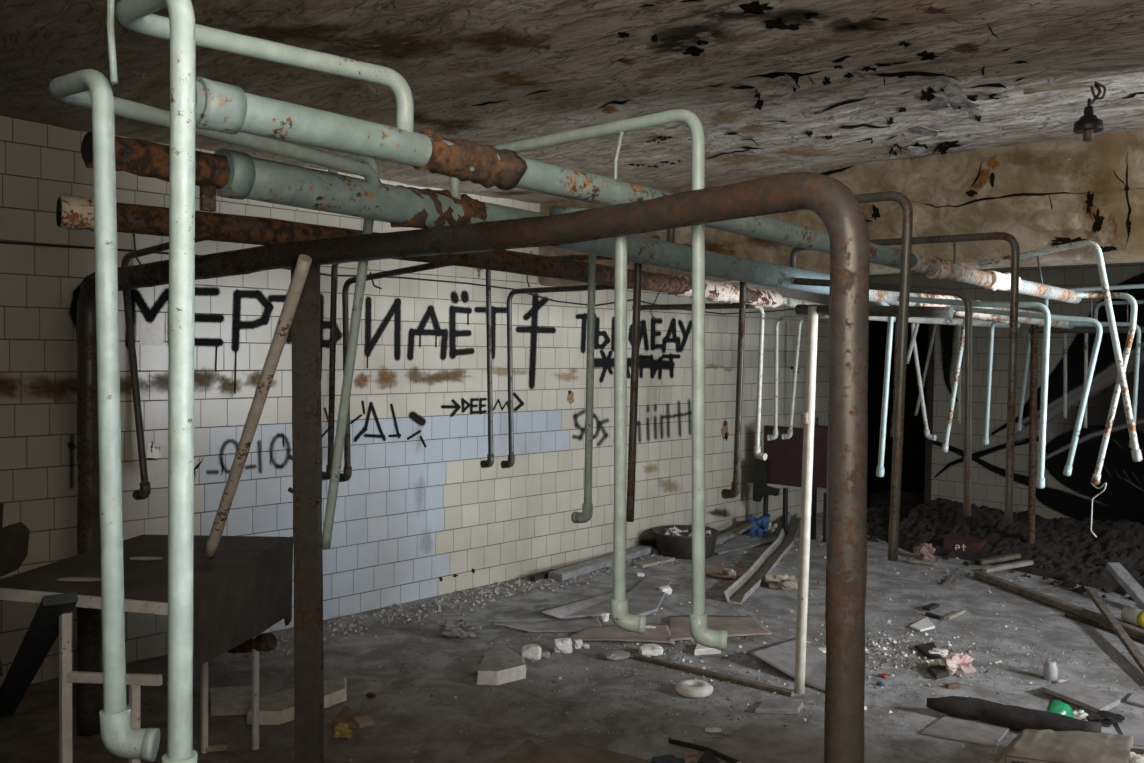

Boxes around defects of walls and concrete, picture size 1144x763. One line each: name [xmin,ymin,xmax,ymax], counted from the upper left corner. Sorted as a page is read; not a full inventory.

peeling [739,1,819,31]
peeling [682,40,709,56]
peeling [708,41,1025,122]
peeling [856,126,969,159]
crack [912,192,1088,209]
crack [1113,152,1143,248]
corrosion [355,368,462,388]